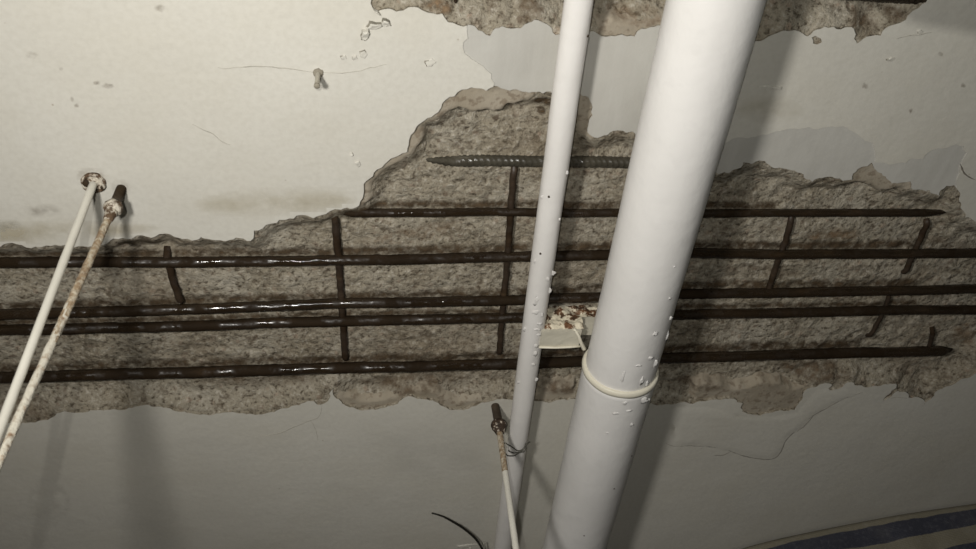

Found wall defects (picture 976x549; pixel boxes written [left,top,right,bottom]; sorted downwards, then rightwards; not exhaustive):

spalling [755,0,927,44]
spalling [0,0,564,423]
rust [340,201,538,213]
spalling [534,0,666,403]
rust [694,232,914,249]
rust [174,244,527,257]
spalling [650,126,976,416]
rust [681,279,915,289]
rust [53,288,527,307]
rust [52,352,515,370]
rust [541,348,588,357]
rust [663,340,858,353]